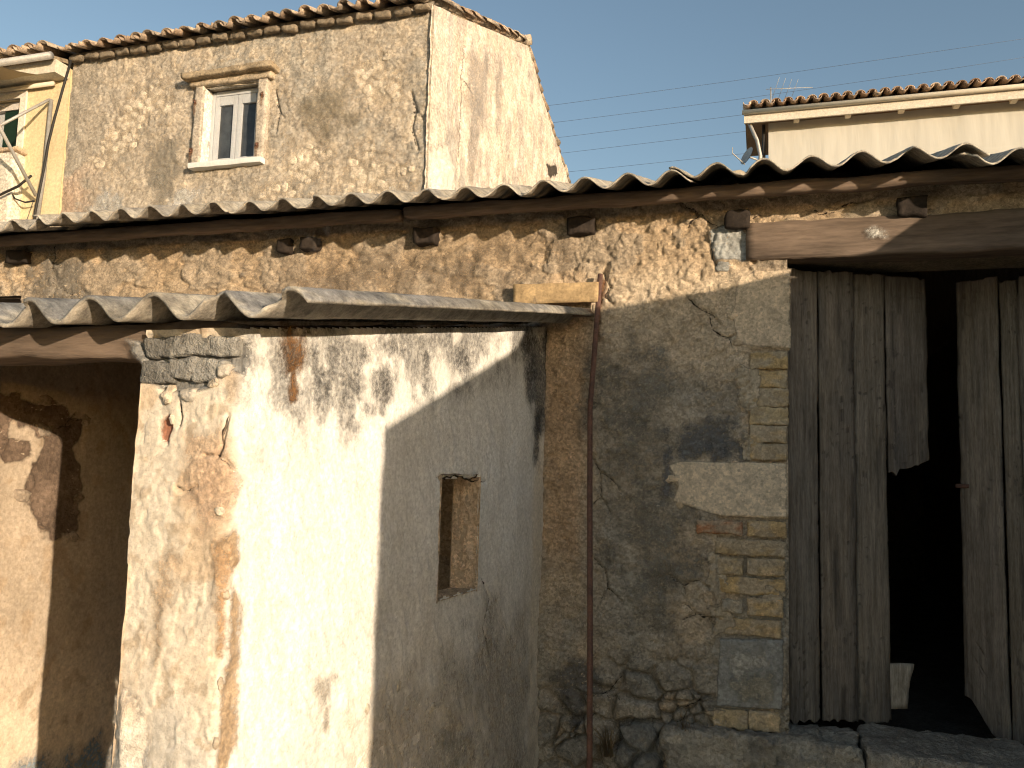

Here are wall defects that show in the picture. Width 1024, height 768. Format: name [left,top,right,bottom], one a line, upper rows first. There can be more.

spalling [128,340,186,363]
spalling [144,344,252,441]
damp [271,319,366,426]
damp [380,319,490,388]
damp [512,323,547,461]
peeling [0,392,91,544]
crack [672,577,715,622]